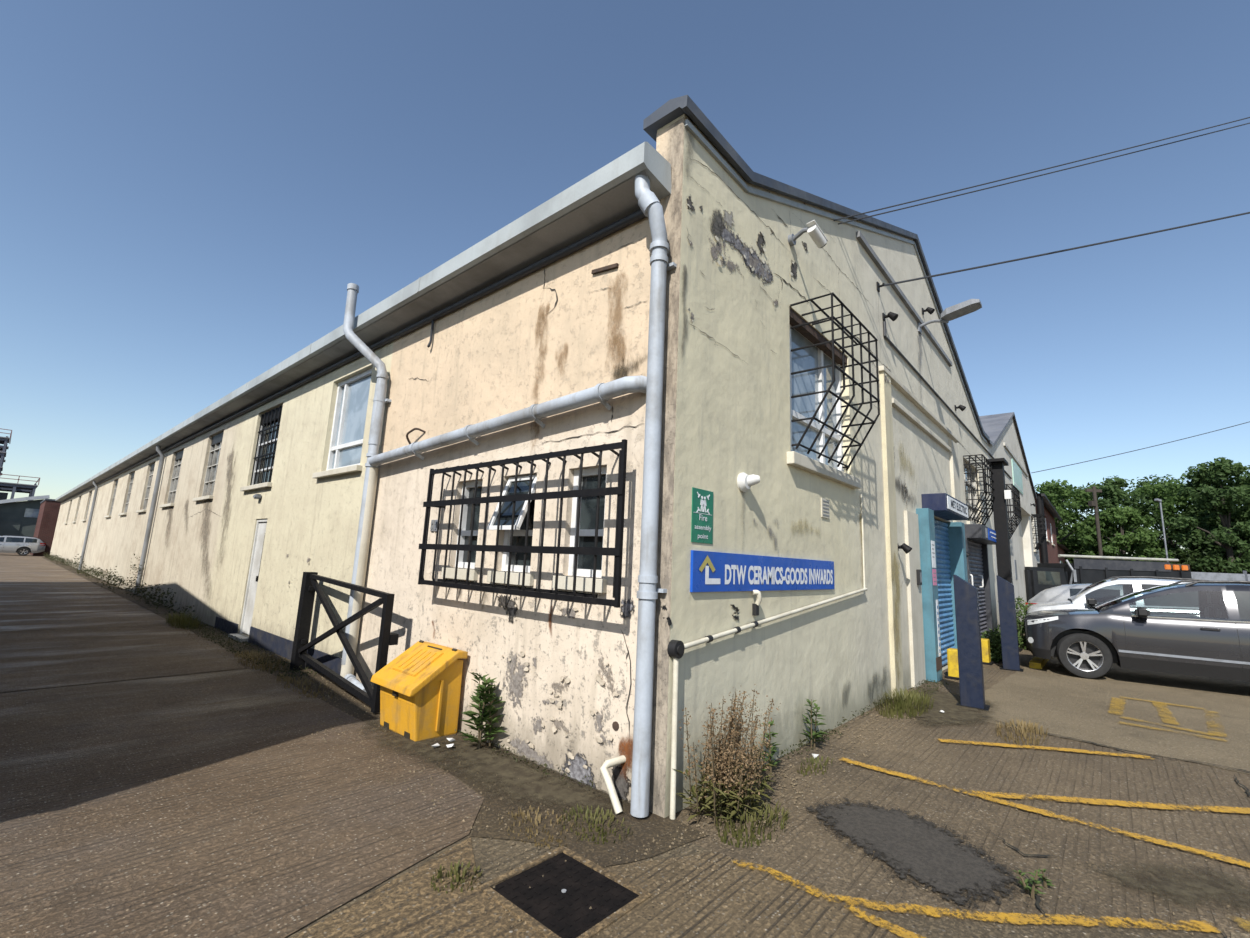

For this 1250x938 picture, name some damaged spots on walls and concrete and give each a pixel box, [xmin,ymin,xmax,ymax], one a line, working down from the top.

flaking render [709,210,774,285]
leakage [536,306,568,368]
leakage [609,282,638,379]
leakage [201,452,234,590]
peeling [558,607,578,618]
flaking render [620,598,634,619]
flaking render [501,651,596,789]
peeling [589,656,618,746]